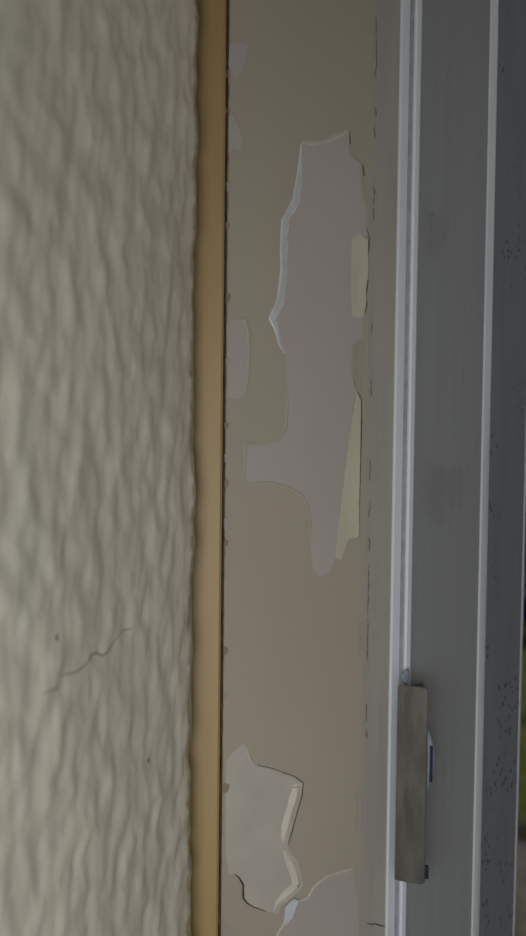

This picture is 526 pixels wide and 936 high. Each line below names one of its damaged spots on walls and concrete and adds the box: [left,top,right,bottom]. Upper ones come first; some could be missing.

peeling [243,130,370,577]
crack [42,628,132,694]
peeling [225,743,359,936]